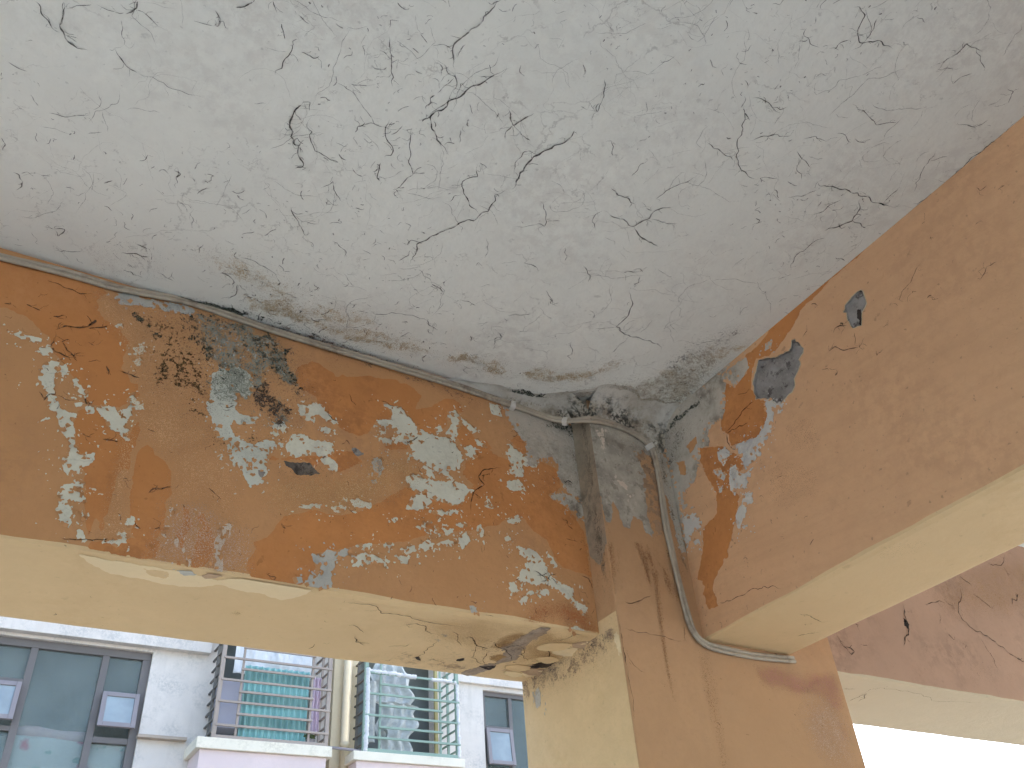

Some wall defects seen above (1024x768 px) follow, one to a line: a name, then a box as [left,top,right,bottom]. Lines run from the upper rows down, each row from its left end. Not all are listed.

crack [38,3,87,50]
crack [285,6,501,199]
crack [401,132,574,305]
crack [710,89,1017,279]
damp [93,256,428,576]
peeling [0,252,862,715]
damp [512,359,624,401]
damp [546,422,620,596]
damp [610,330,745,462]
spalling [843,290,867,329]
crack [349,603,550,664]
crack [902,609,910,644]